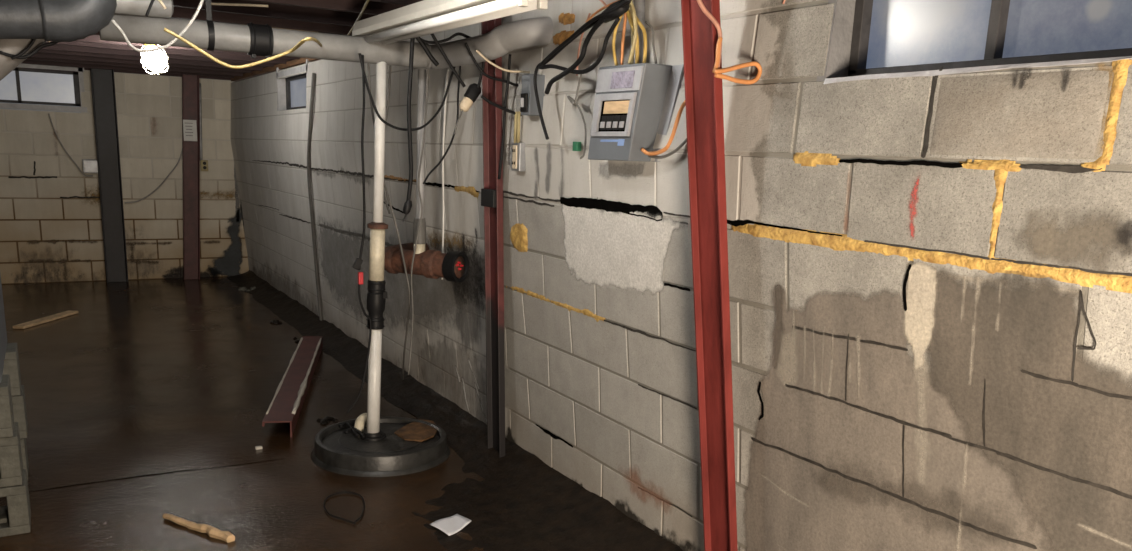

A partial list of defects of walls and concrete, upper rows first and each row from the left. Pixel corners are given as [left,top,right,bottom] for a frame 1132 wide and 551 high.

leakage [430,228,477,256]
crack [252,160,690,225]
crack [727,59,1132,387]
leakage [744,271,1132,551]
crack [930,380,1023,461]